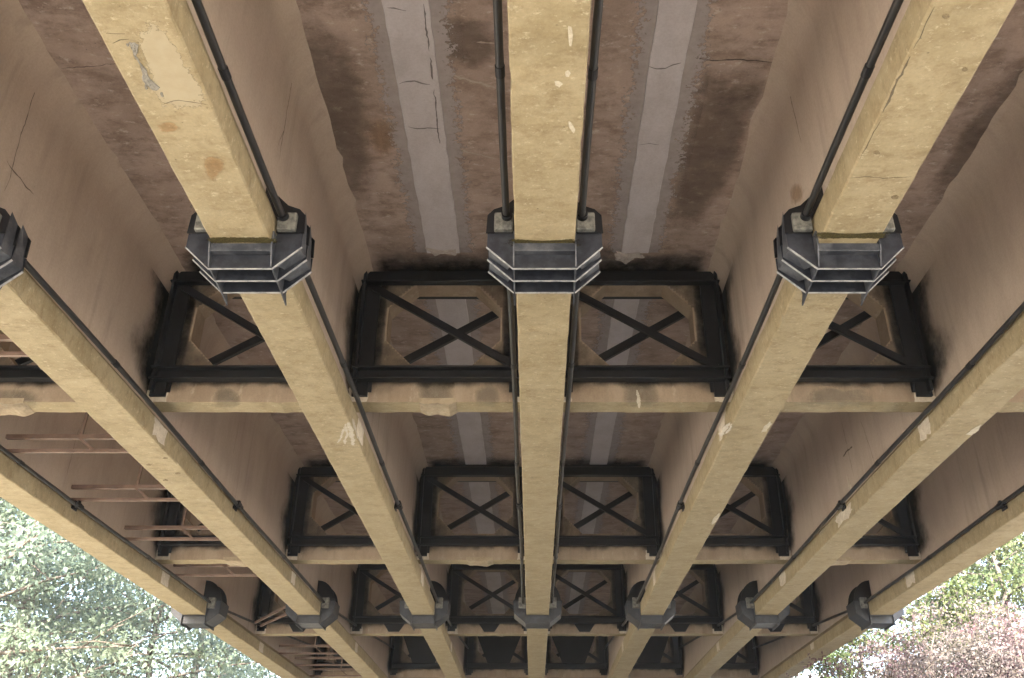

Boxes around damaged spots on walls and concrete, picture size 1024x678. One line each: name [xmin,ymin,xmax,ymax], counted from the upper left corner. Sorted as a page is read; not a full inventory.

spalling [126,42,163,97]
crack [392,4,440,142]
crack [4,92,35,191]